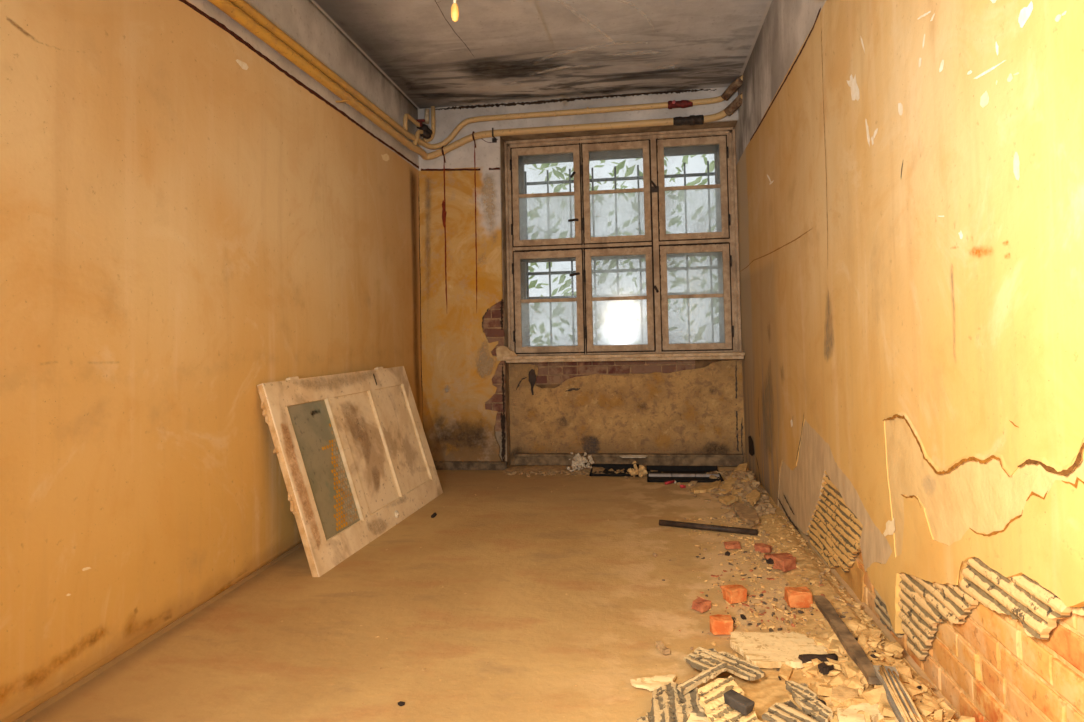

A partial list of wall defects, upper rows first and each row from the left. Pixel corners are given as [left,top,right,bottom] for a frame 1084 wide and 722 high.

peeling [1018,1,1033,28]
peeling [847,74,859,101]
peeling [967,42,1019,108]
spalling [528,369,536,395]
crack [883,411,1084,536]
spalling [779,417,1084,722]